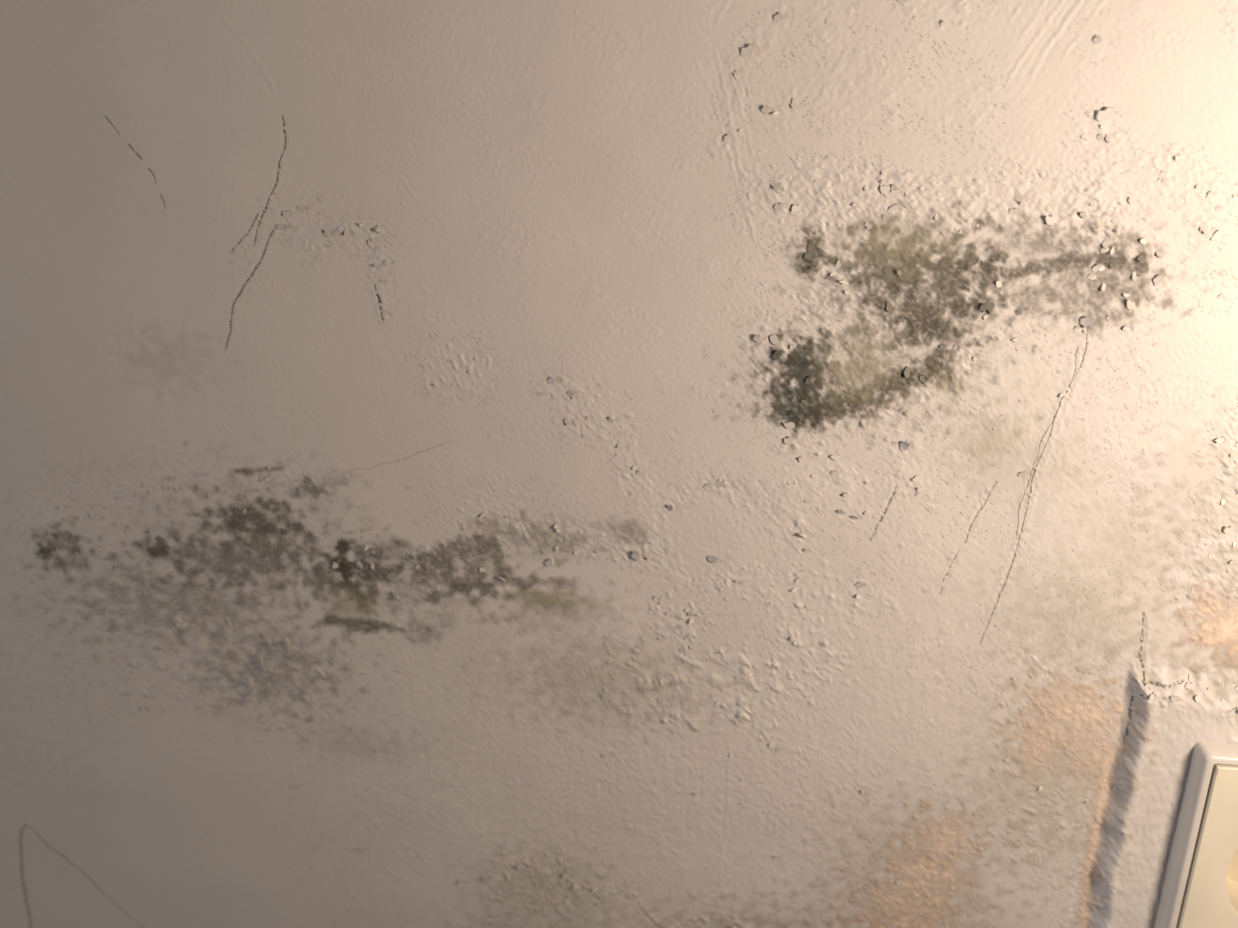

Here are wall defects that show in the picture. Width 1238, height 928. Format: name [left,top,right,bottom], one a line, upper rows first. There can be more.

crack [225,117,286,349]
peeling [226,186,397,327]
mould [771,237,977,427]
spalling [703,96,1238,530]
mould [204,498,311,549]
mould [327,540,403,632]
spalling [645,572,746,646]
spalling [822,463,1238,928]